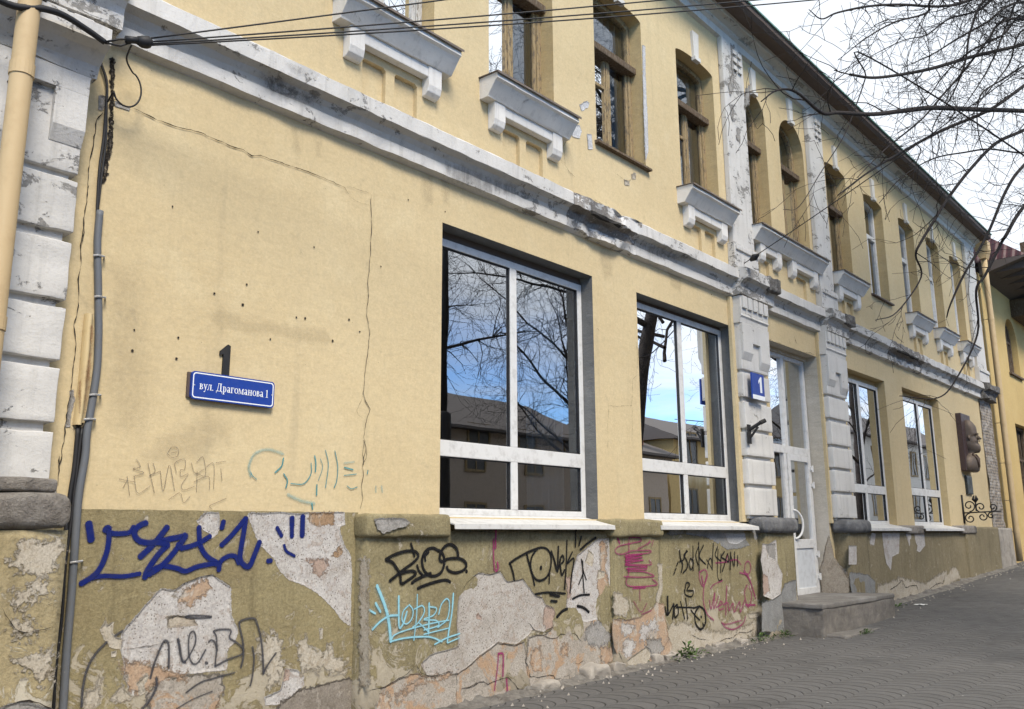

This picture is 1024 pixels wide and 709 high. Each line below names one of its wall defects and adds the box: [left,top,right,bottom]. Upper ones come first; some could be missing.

peeling [728,43,751,143]
crack [58,94,372,508]
peeling [0,536,70,690]
peeling [83,574,238,709]
peeling [197,512,220,538]
peeling [247,511,762,709]
peeling [761,540,783,600]
flaking render [870,532,961,600]